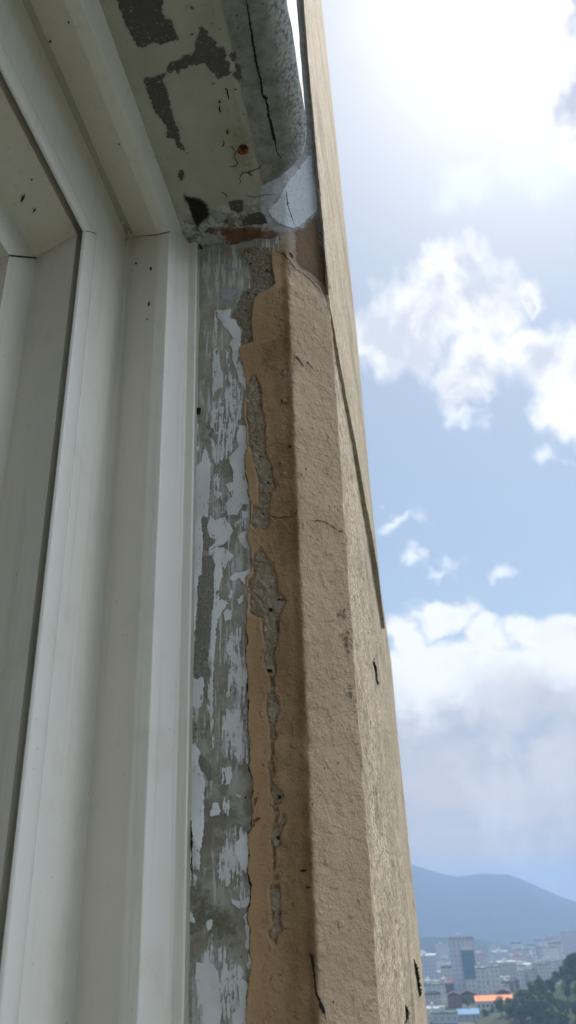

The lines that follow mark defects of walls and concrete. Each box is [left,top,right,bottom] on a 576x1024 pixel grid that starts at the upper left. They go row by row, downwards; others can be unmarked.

peeling [117,0,242,154]
crack [218,0,295,225]
spalling [225,200,268,226]
spalling [190,246,287,941]
peeling [195,897,251,1024]
crack [308,952,327,1022]